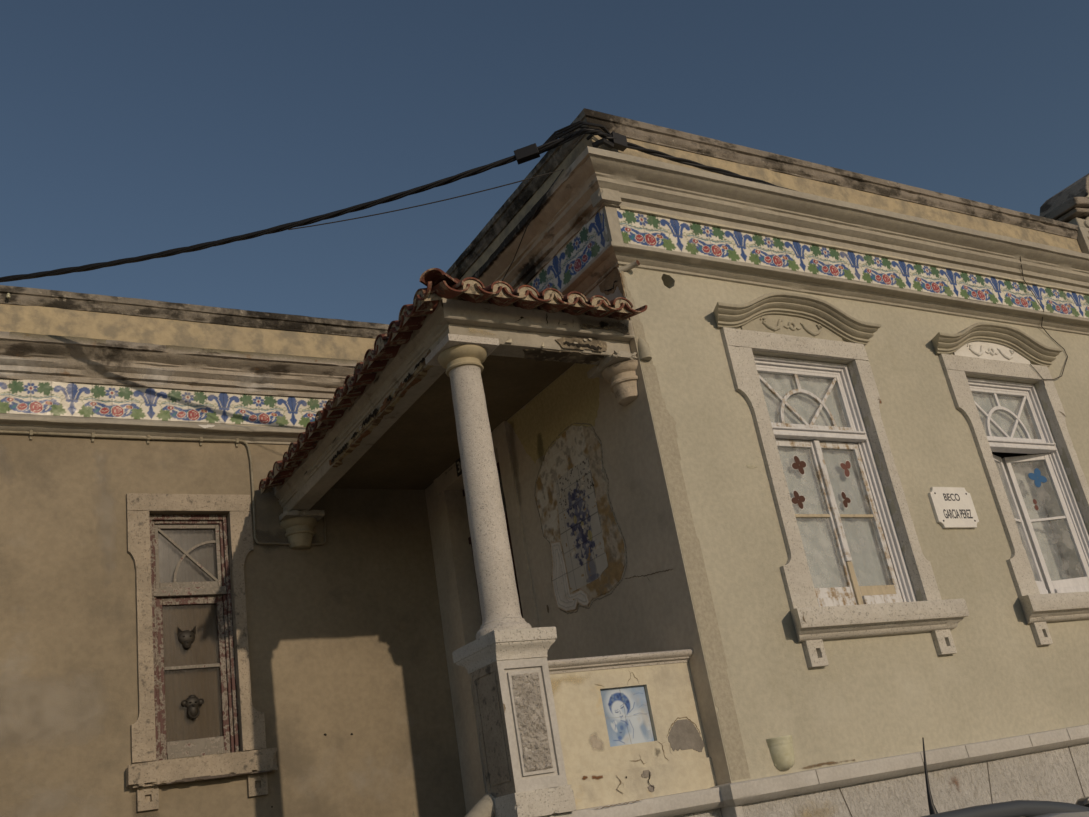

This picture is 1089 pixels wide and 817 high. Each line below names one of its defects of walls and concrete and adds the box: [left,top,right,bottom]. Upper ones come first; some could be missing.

water stain [584,108,619,133]
water stain [472,193,549,278]
water stain [517,258,541,285]
water stain [248,311,319,333]
flaking render [523,322,630,364]
peeling [534,422,627,614]